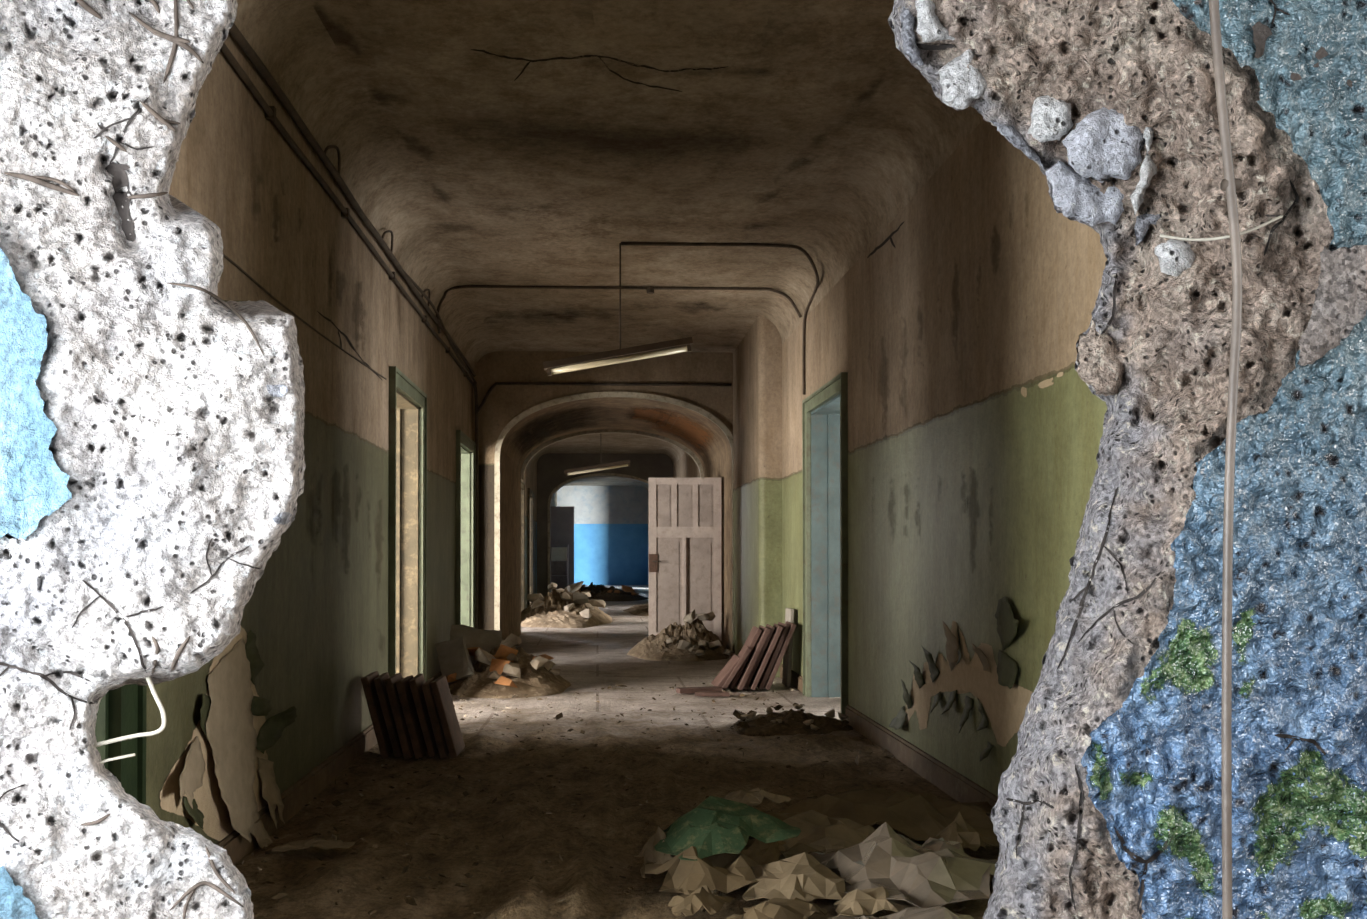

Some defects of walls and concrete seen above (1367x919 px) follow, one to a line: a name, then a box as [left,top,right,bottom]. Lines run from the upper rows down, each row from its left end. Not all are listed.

crack [94,97,154,163]
crack [471,49,729,92]
spalling [0,0,306,919]
spalling [888,0,1334,919]
crack [71,538,260,673]
crack [1056,487,1161,671]
crack [0,662,95,730]
crack [0,784,31,850]
peeling [1247,749,1367,881]
peeling [1295,893,1367,919]